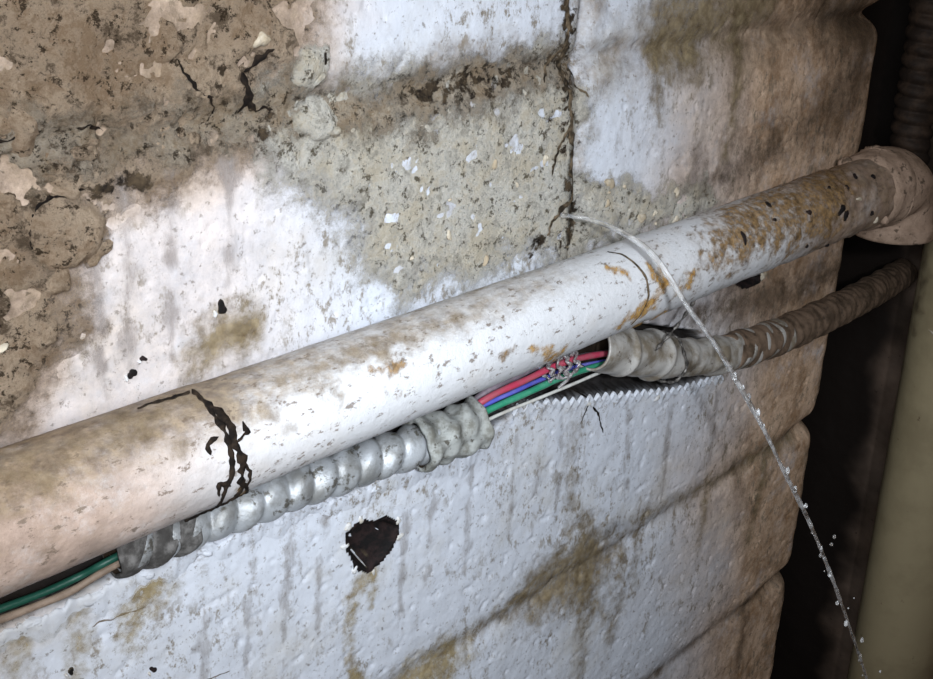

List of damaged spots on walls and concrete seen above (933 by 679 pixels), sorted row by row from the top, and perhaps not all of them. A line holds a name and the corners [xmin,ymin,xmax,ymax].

crack [177,59,215,114]
crack [238,49,274,113]
crack [543,0,589,245]
flaking render [0,0,724,434]
peeling [0,449,483,654]
leakage [506,521,622,624]
leakage [398,635,466,679]